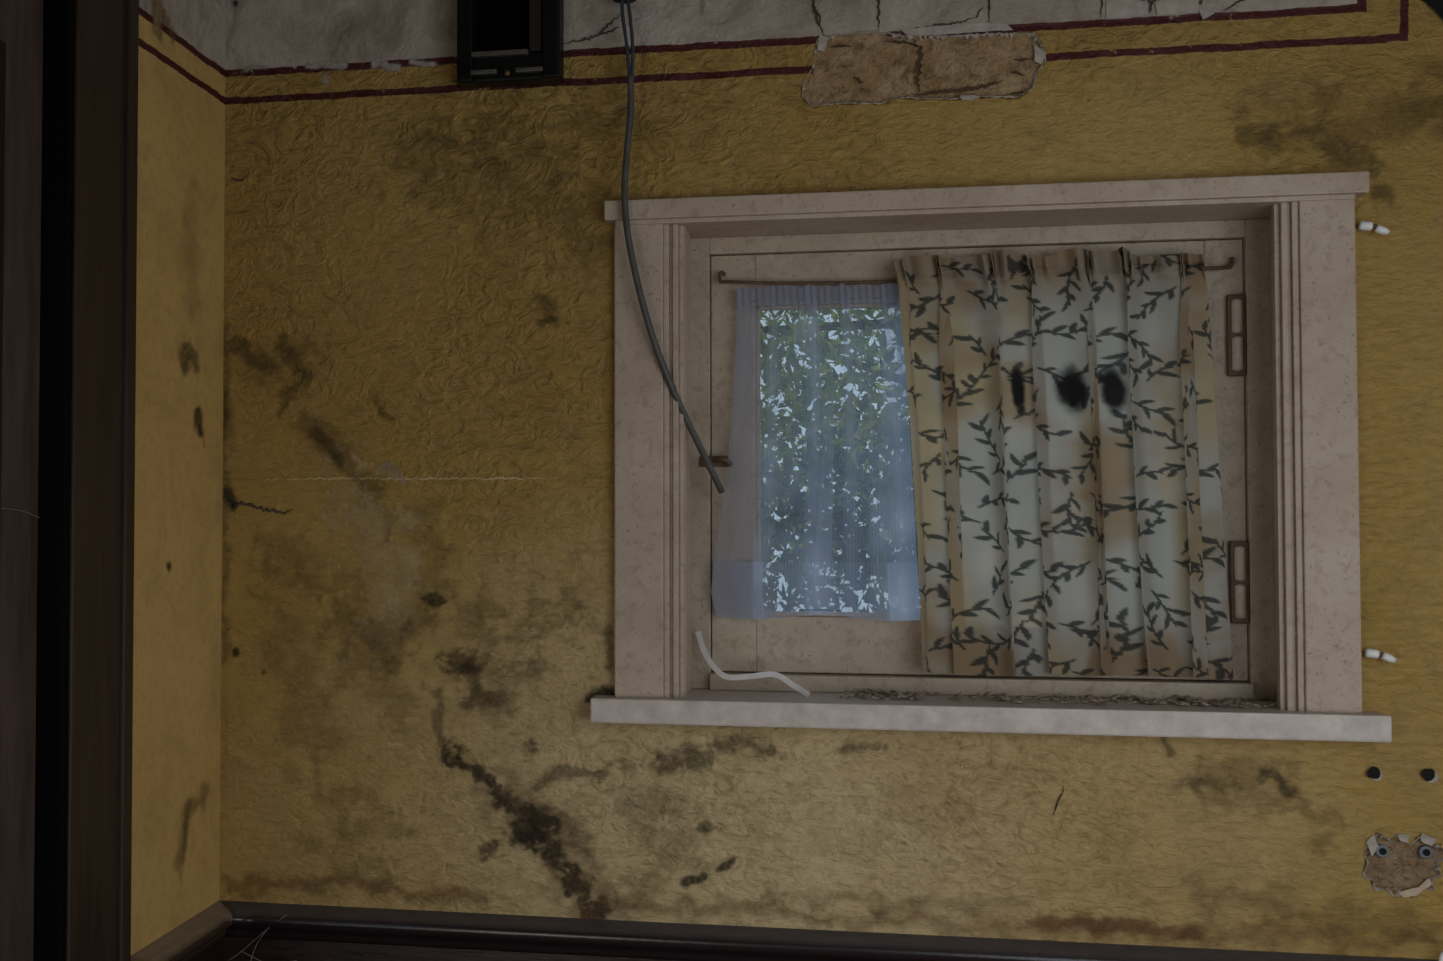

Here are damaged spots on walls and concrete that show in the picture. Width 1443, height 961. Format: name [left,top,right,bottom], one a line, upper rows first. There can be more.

crack [811,0,825,36]
crack [876,0,990,32]
crack [1100,0,1245,19]
flaking render [801,23,1047,107]
water stain [586,686,615,702]
water stain [442,741,609,920]
flaking render [1363,831,1443,898]
water stain [1038,917,1202,939]